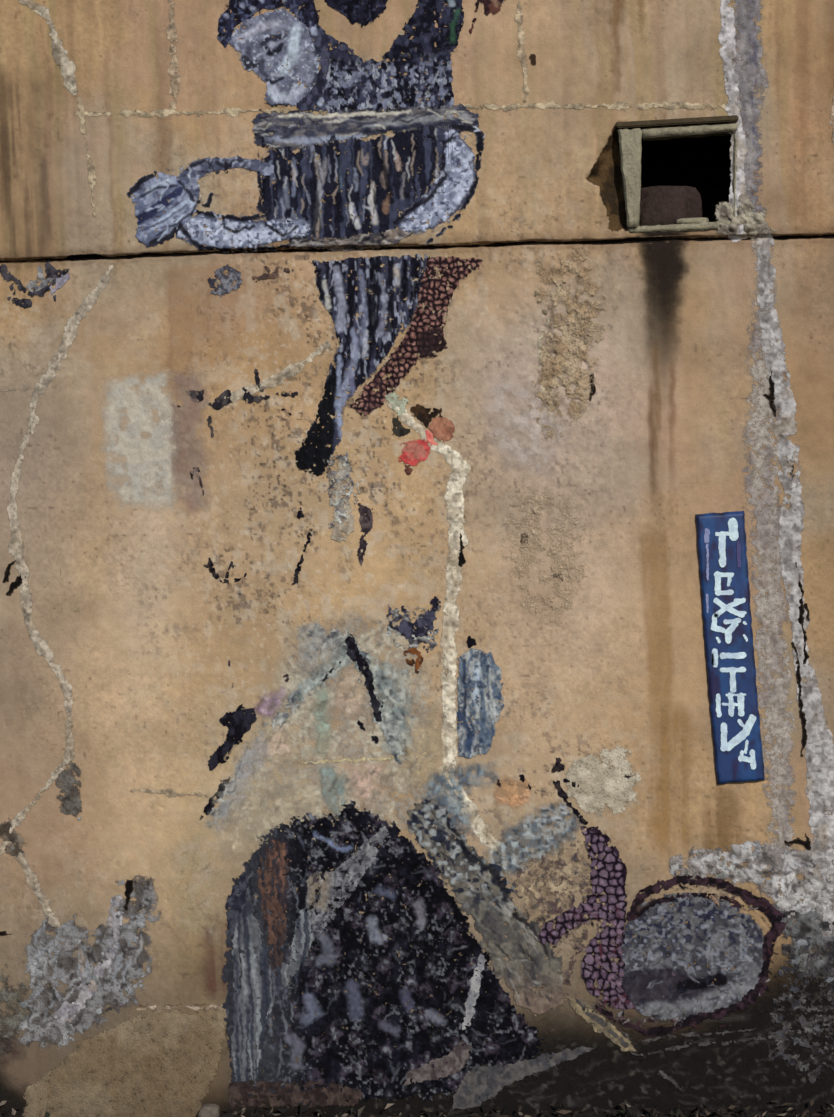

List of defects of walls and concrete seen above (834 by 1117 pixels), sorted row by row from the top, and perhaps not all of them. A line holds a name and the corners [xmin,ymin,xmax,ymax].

crack [19,0,328,217]
flaking render [494,248,606,461]
leakage [642,221,685,339]
crack [450,0,834,937]
crack [0,238,665,928]
flaking render [565,745,641,816]
spalling [0,875,161,1055]
crack [52,894,124,1031]
crack [136,1003,223,1011]